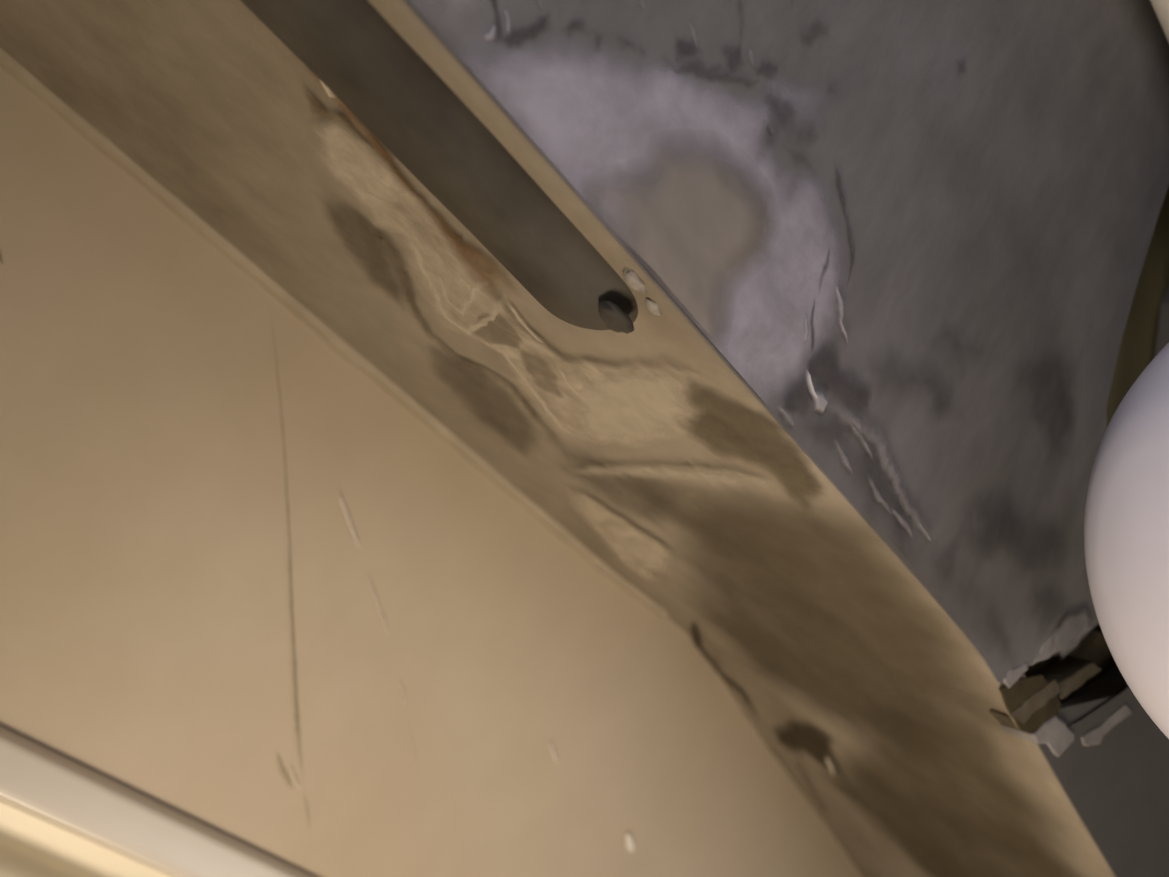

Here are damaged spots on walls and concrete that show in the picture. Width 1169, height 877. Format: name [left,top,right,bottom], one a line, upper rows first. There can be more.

water stain [474,54,838,396]
crack [277,371,298,730]
water stain [693,395,818,507]
flaking render [780,351,931,540]
water stain [681,514,1070,877]
peeling [1055,611,1091,654]